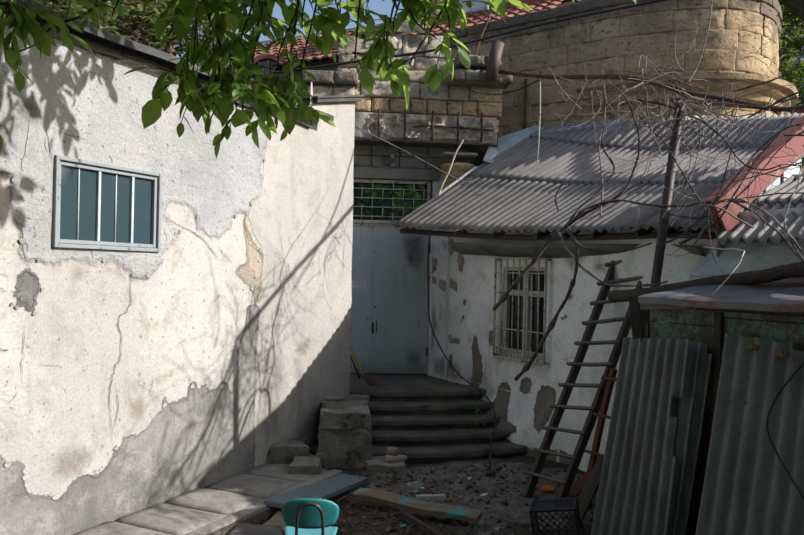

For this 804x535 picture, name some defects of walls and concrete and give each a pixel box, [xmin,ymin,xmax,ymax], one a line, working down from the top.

crack [0,120,91,270]
crack [0,332,25,410]
crack [109,261,155,441]
peeling [0,25,268,535]
peeling [470,336,483,387]
peeling [489,377,556,444]